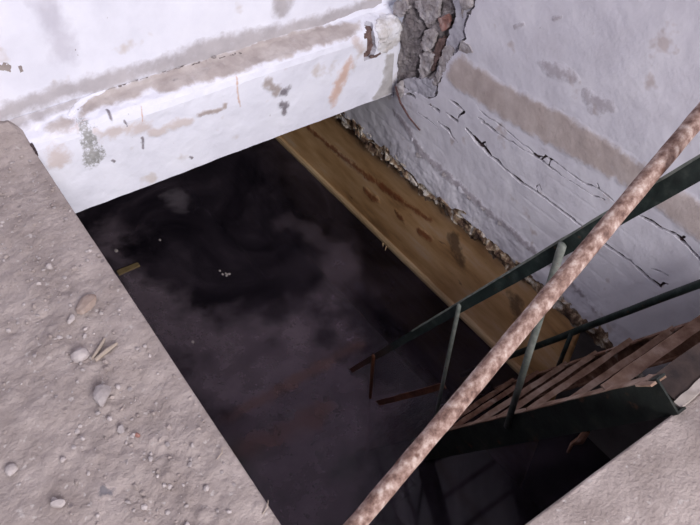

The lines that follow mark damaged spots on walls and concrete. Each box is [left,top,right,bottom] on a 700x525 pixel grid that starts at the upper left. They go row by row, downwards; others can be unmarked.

damp [0,0,382,121]
peeling [9,0,648,189]
corrosion [326,34,367,110]
damp [537,58,618,119]
damp [42,115,196,171]
spalling [333,107,539,271]
crack [437,101,572,217]
crack [644,216,699,256]
flaking render [653,189,700,244]
spalling [522,275,544,294]
spalling [551,281,614,349]